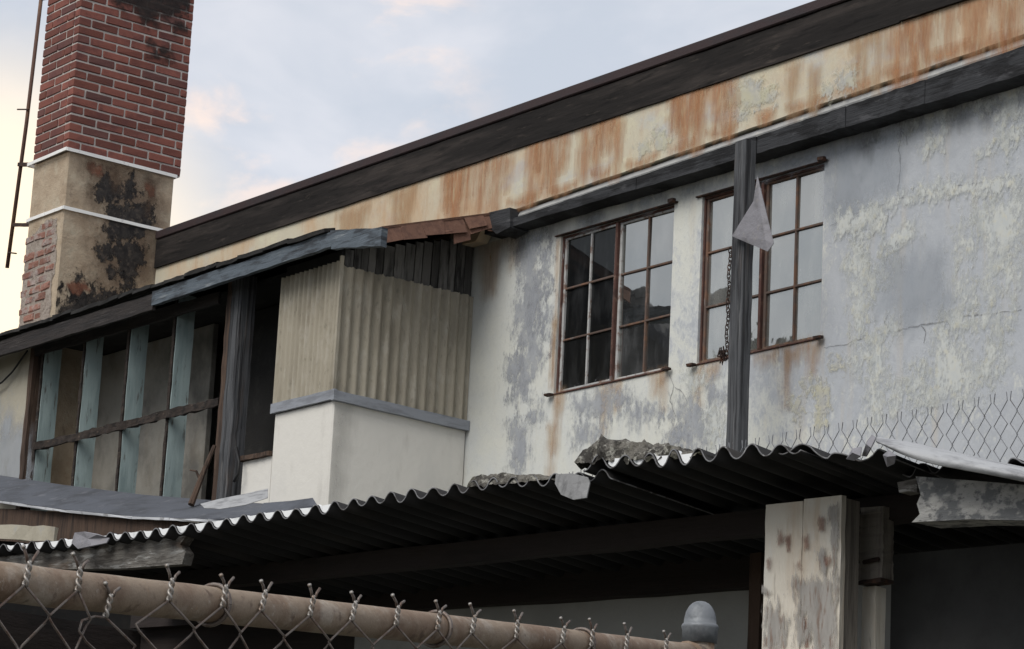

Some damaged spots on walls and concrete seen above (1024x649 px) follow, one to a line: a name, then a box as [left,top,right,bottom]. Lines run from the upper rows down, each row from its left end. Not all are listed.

leakage [112,0,190,61]
corrosion [675,90,703,140]
peeling [896,87,1024,161]
corrosion [446,158,501,217]
spalling [18,218,57,328]
leakage [56,234,146,313]
crack [824,309,1022,348]
peeling [834,172,1024,416]